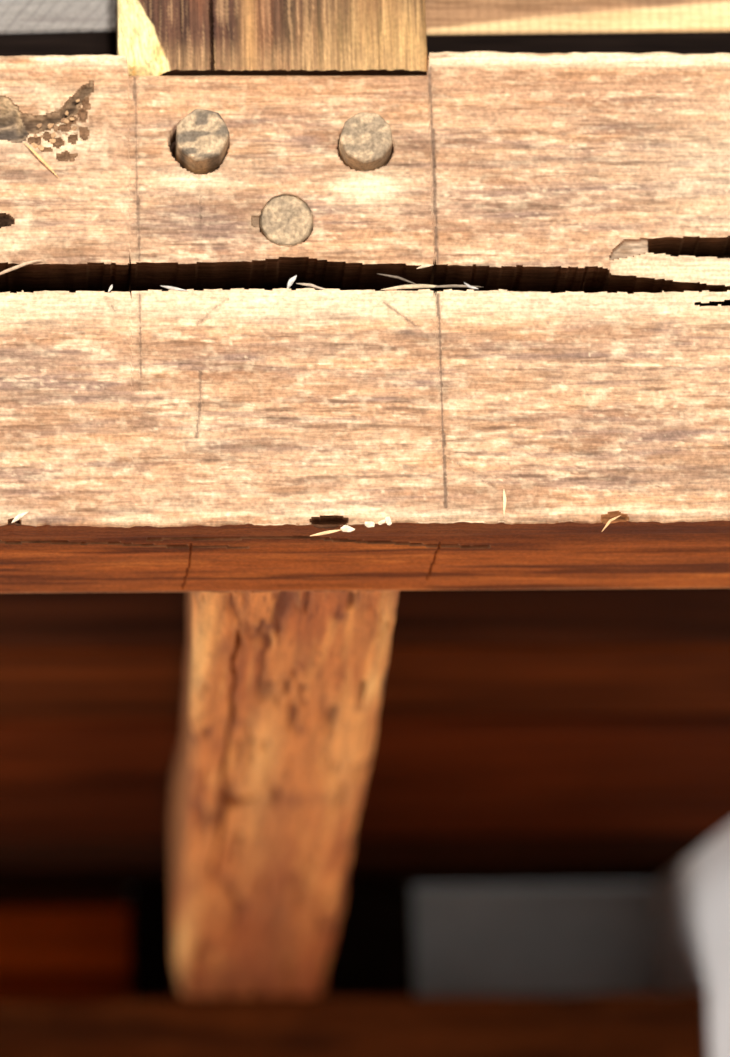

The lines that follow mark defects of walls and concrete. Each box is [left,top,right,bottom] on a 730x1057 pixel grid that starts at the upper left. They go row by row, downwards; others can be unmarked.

crack [208,0,216,70]
spalling [0,80,94,162]
crack [0,236,730,306]